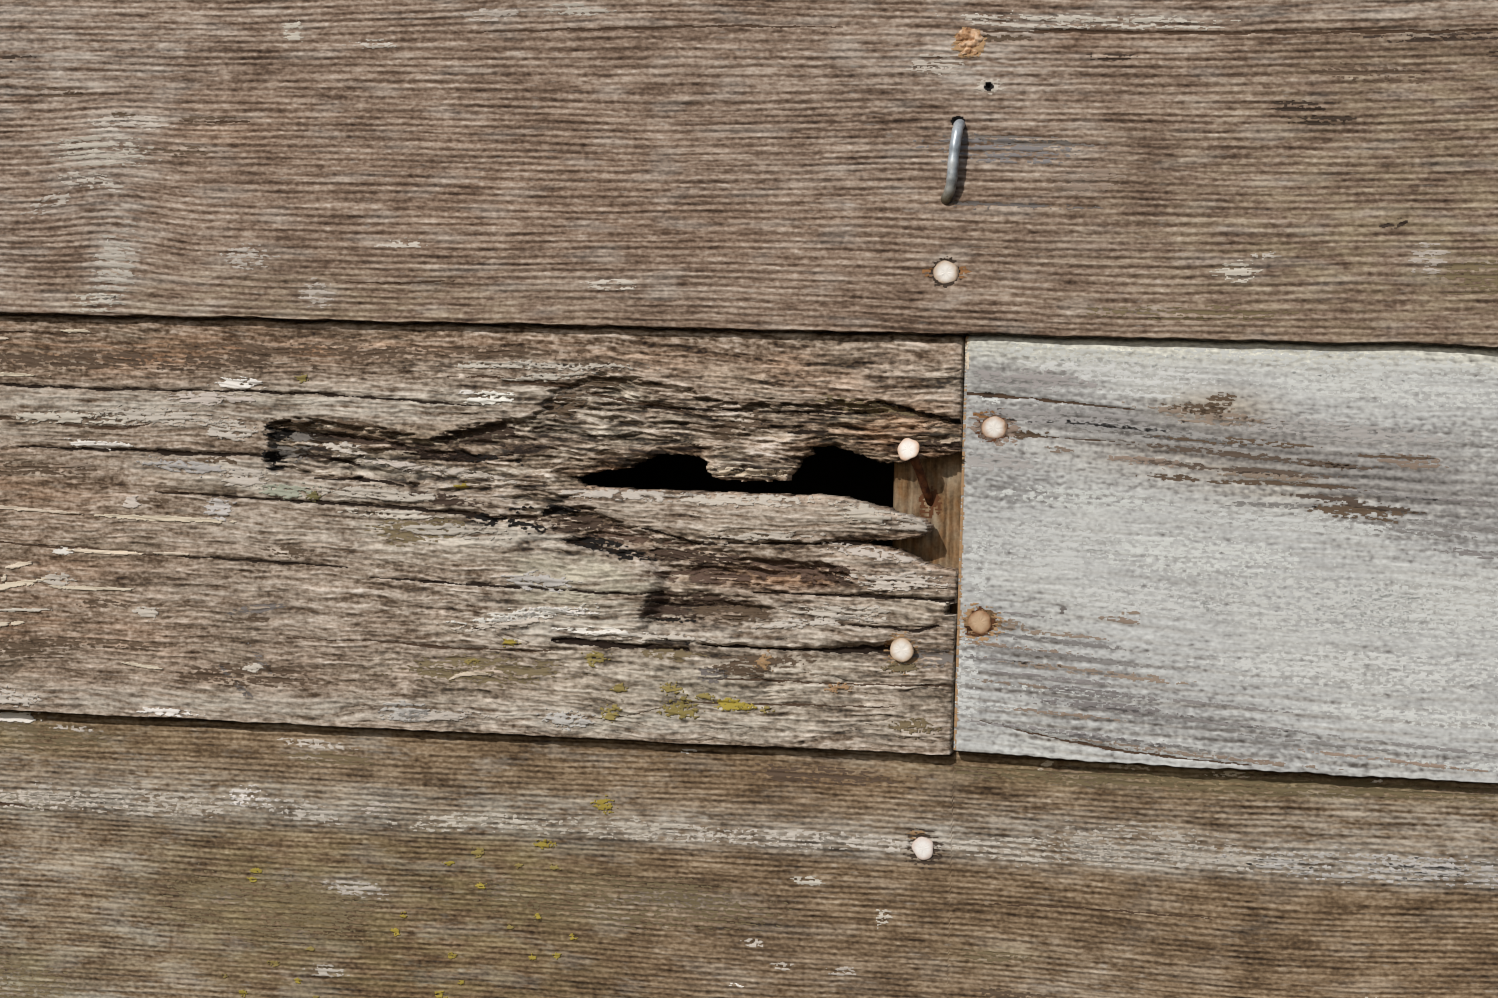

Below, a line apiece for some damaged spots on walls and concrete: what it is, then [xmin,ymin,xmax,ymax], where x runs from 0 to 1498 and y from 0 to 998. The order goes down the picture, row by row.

corrosion [951,27,1032,58]
crack [0,375,1135,518]